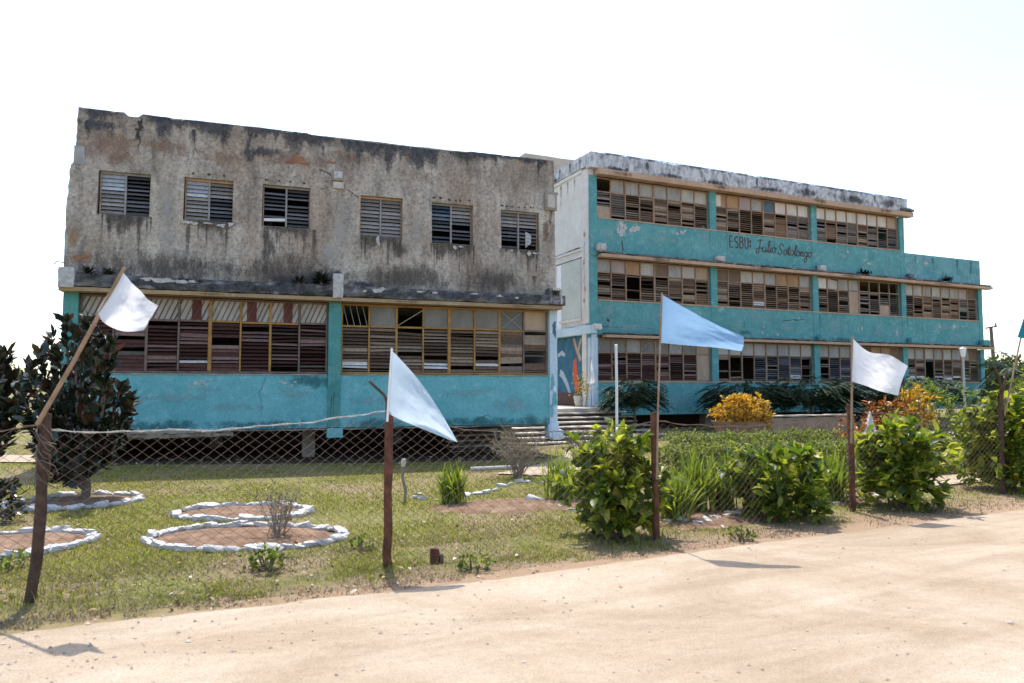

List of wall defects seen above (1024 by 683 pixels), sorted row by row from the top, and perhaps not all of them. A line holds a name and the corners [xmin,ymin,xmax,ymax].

damp [78,109,119,139]
damp [148,116,546,172]
damp [605,152,902,208]
damp [101,213,152,241]
damp [186,219,232,242]
peeling [616,220,640,237]
damp [94,226,549,303]